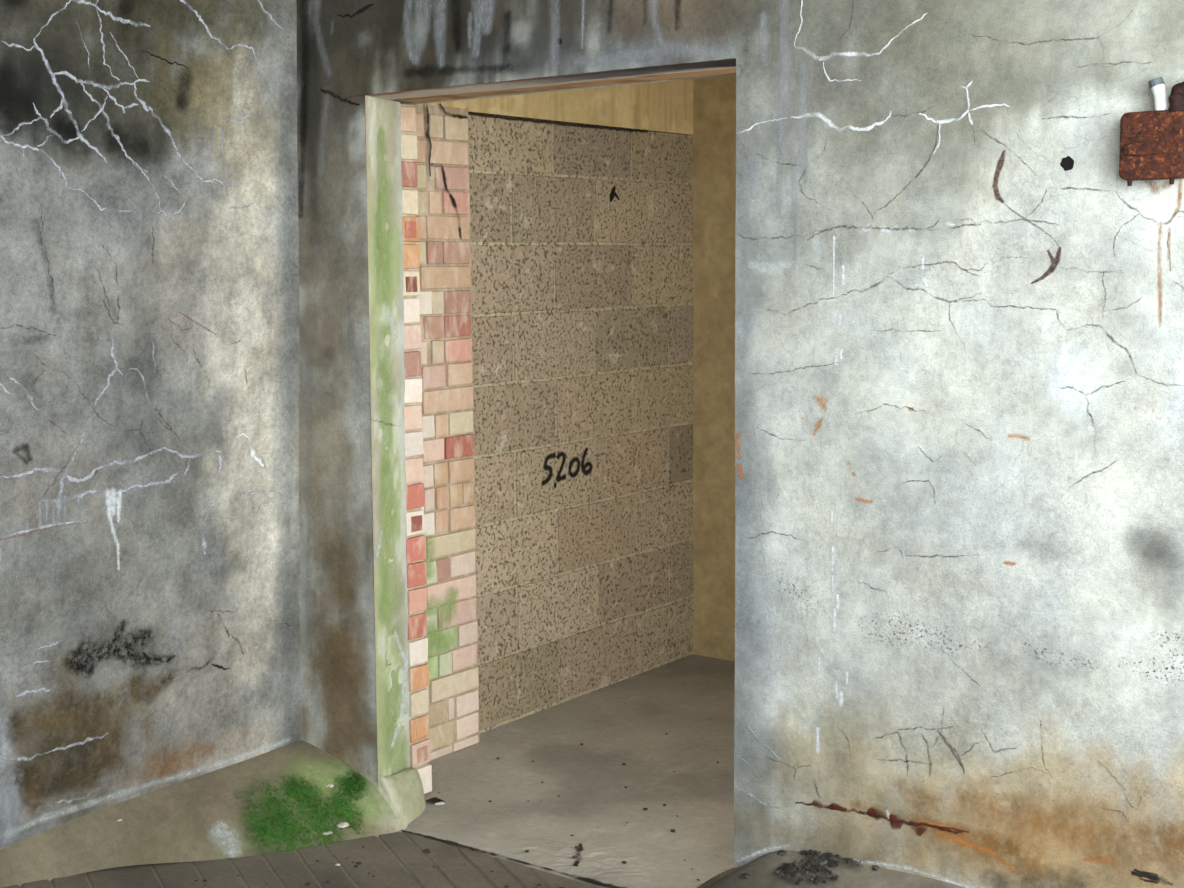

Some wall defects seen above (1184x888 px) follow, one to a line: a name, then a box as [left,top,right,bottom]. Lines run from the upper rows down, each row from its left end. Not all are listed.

crack [258,0,285,31]
crack [819,0,927,82]
crack [0,0,264,263]
crack [426,103,648,239]
crack [742,81,1097,236]
crack [907,261,1058,332]
crack [0,247,222,570]
water stain [1,696,117,837]
corrosion [795,801,1012,869]